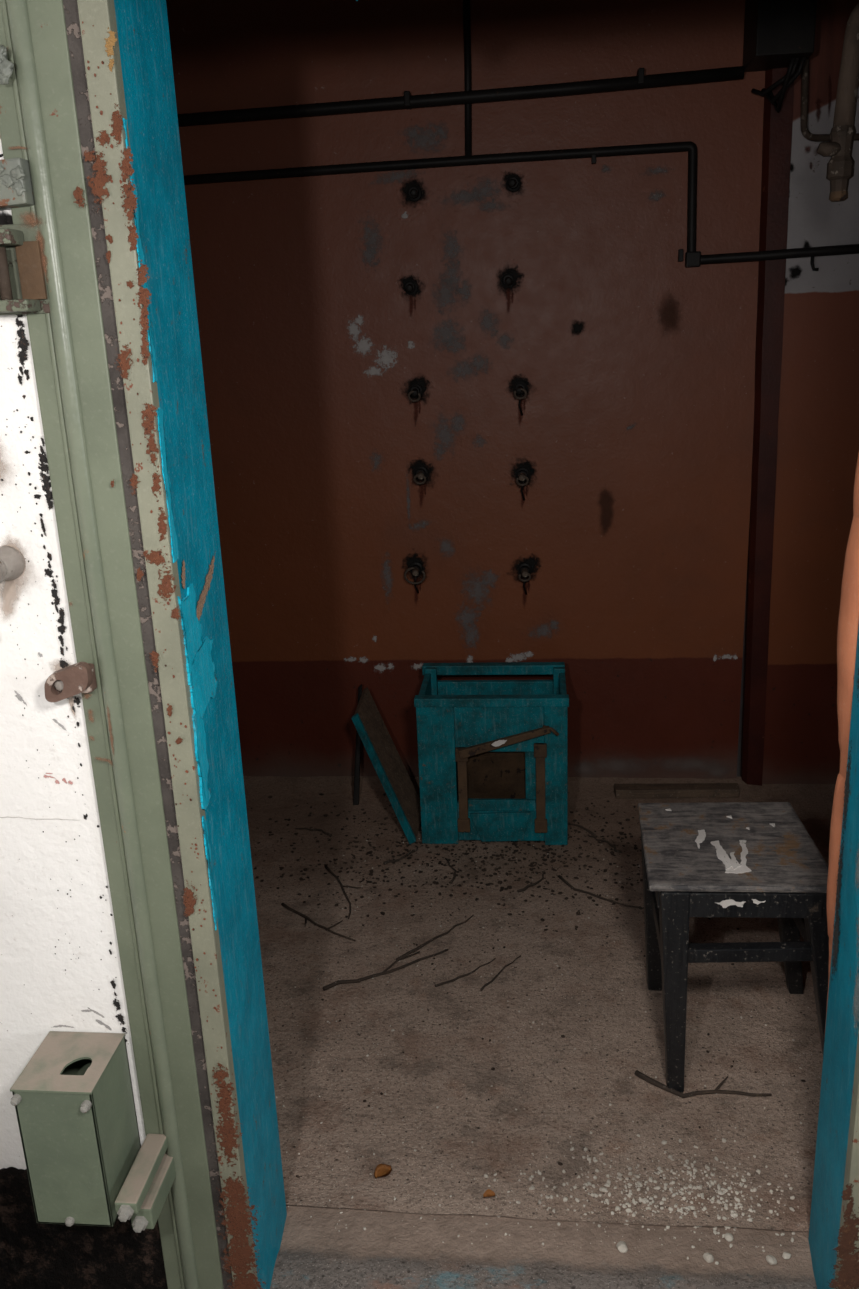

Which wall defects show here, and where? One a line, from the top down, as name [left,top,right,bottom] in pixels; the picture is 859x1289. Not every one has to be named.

rust [82,21,117,77]
rust [73,93,181,620]
rust [149,649,175,678]
rust [167,704,192,805]
rust [183,871,207,931]
rust [210,1046,266,1289]
rust [827,1184,859,1289]